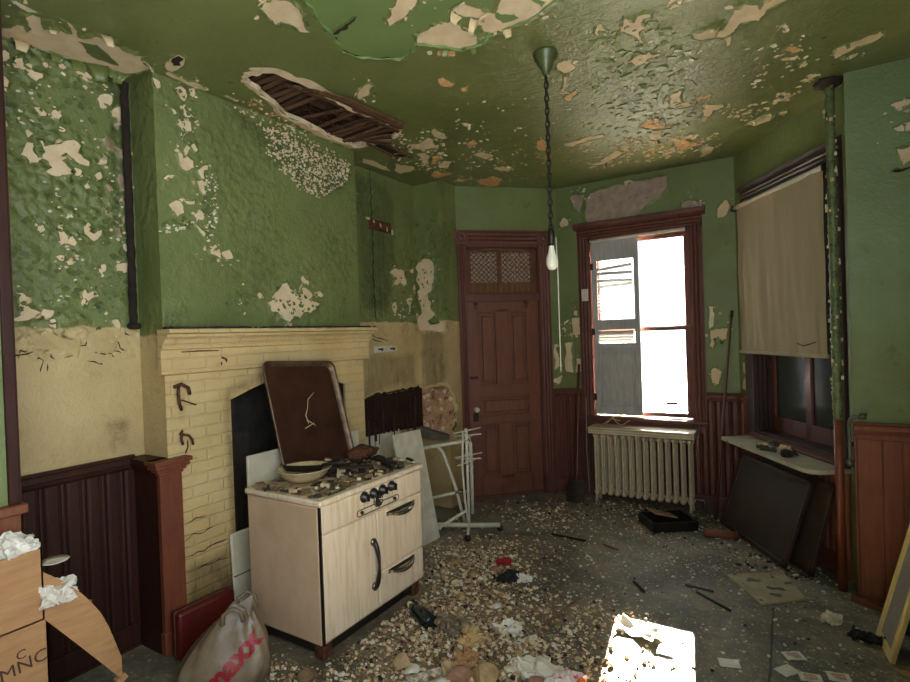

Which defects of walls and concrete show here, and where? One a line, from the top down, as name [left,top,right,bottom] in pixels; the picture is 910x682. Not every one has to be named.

peeling [1,0,239,332]
peeling [220,0,888,198]
flaking render [557,173,671,230]
peeling [883,97,910,168]
peeling [223,275,324,326]
peeling [388,253,448,335]
crack [16,331,130,372]
peeling [552,299,581,385]